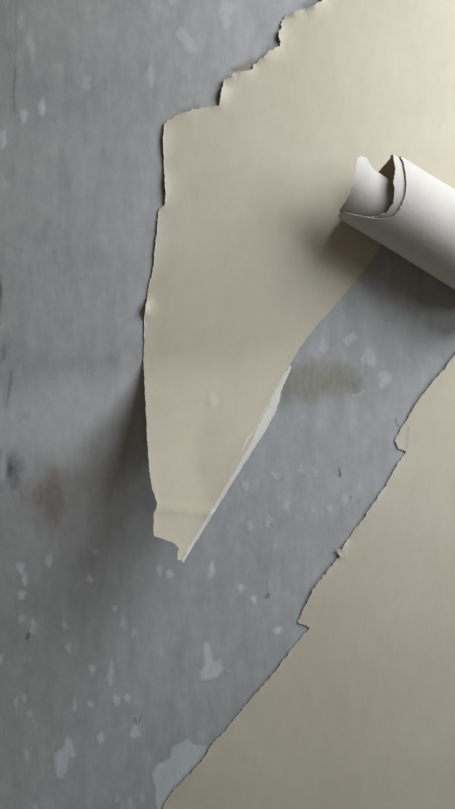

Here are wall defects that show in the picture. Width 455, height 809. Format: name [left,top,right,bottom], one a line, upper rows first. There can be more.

peeling [143,330,312,562]
flaking render [197,639,227,683]
flaking render [51,733,79,781]